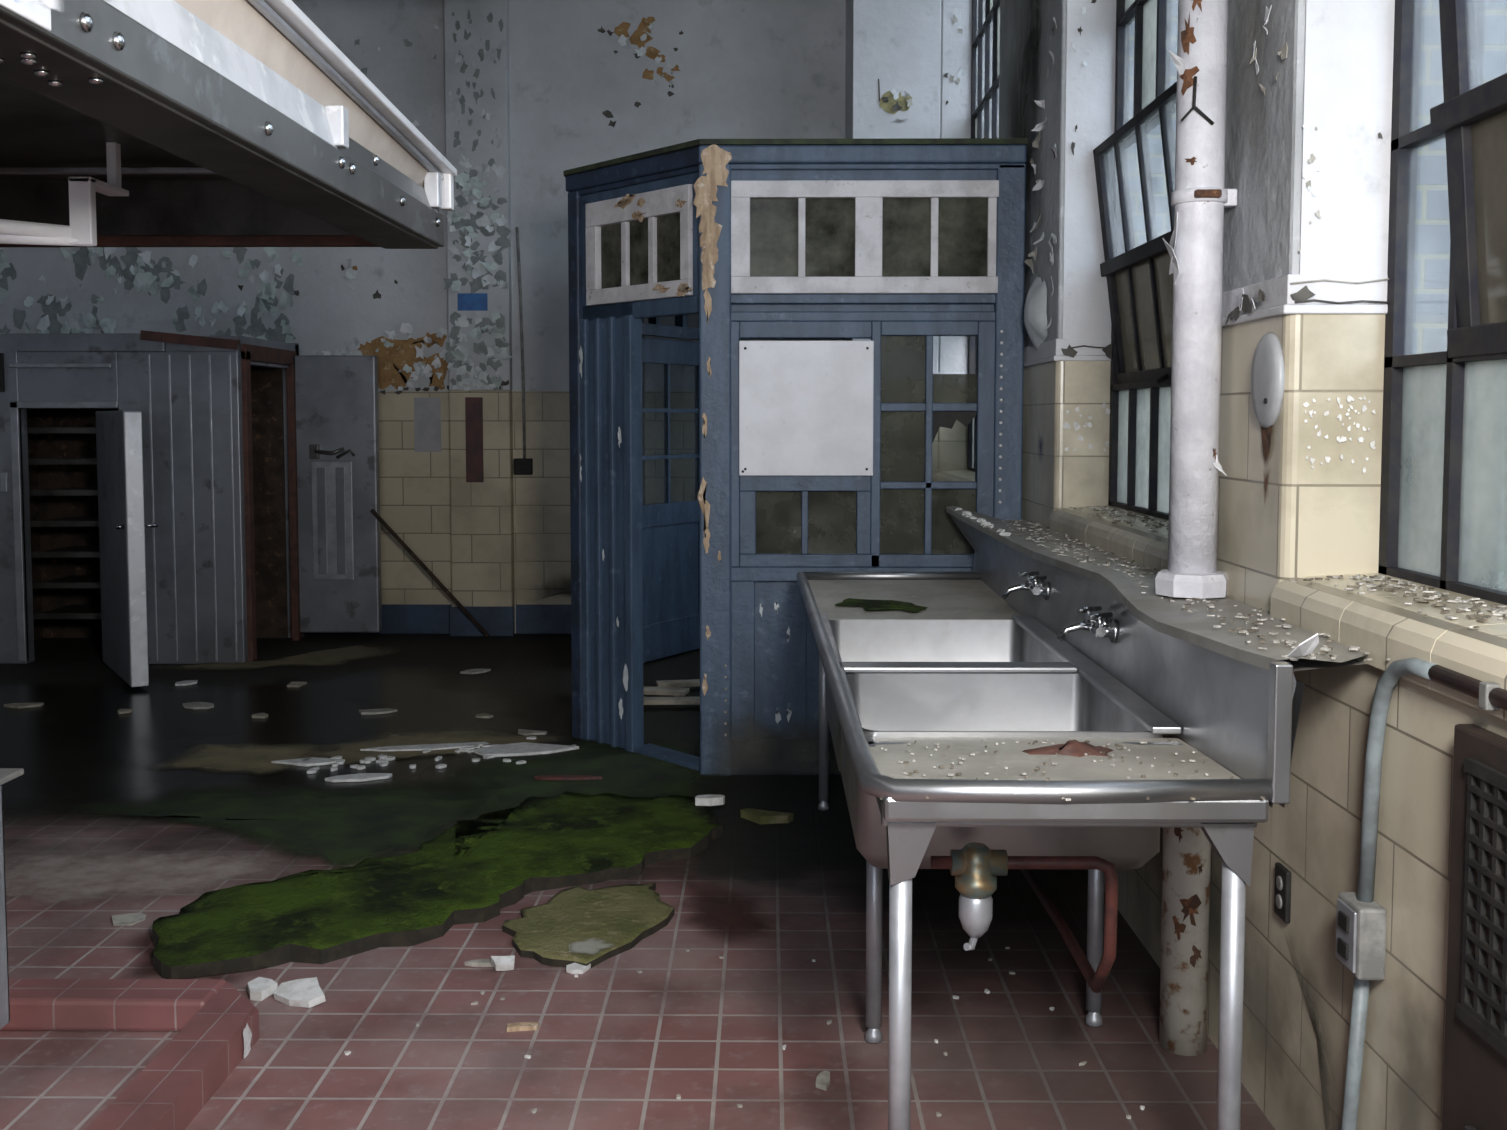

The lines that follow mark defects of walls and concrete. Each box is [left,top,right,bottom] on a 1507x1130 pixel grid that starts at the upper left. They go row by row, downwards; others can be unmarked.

peeling [597,17,683,97]
corrosion [1180,0,1202,95]
spalling [878,79,913,122]
peeling [433,10,511,293]
peeling [0,247,302,343]
peeling [312,312,513,395]
corrosion [1261,426,1272,496]
peeling [697,477,721,561]
damp [571,938,612,954]
corrosion [1172,894,1202,968]